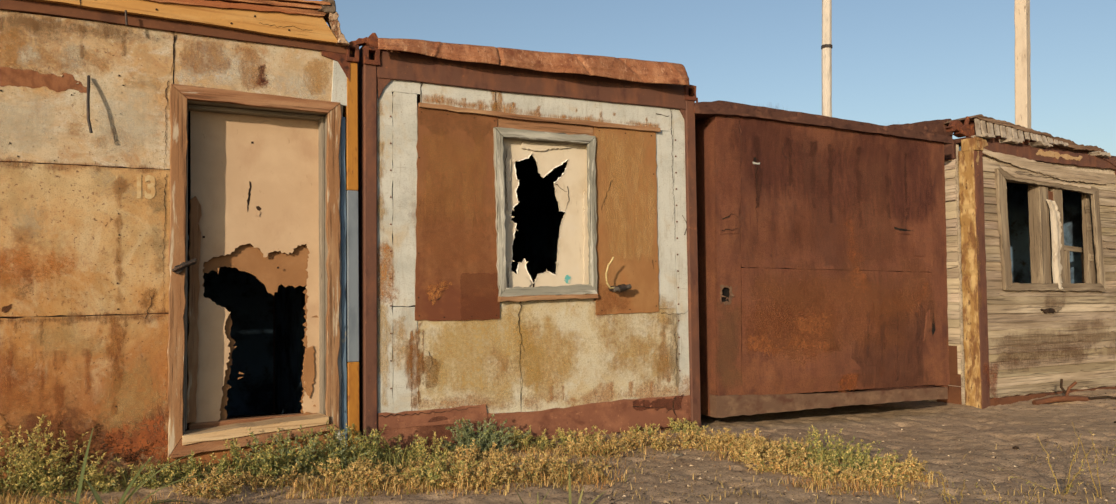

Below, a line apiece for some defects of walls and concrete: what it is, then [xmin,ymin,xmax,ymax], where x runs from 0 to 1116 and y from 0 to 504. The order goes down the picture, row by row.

peeling [0,47,87,93]
corrosion [243,51,268,86]
corrosion [377,244,396,371]
corrosion [399,313,528,406]
crack [518,283,534,406]
corrosion [604,303,680,385]
corrosion [0,412,168,470]